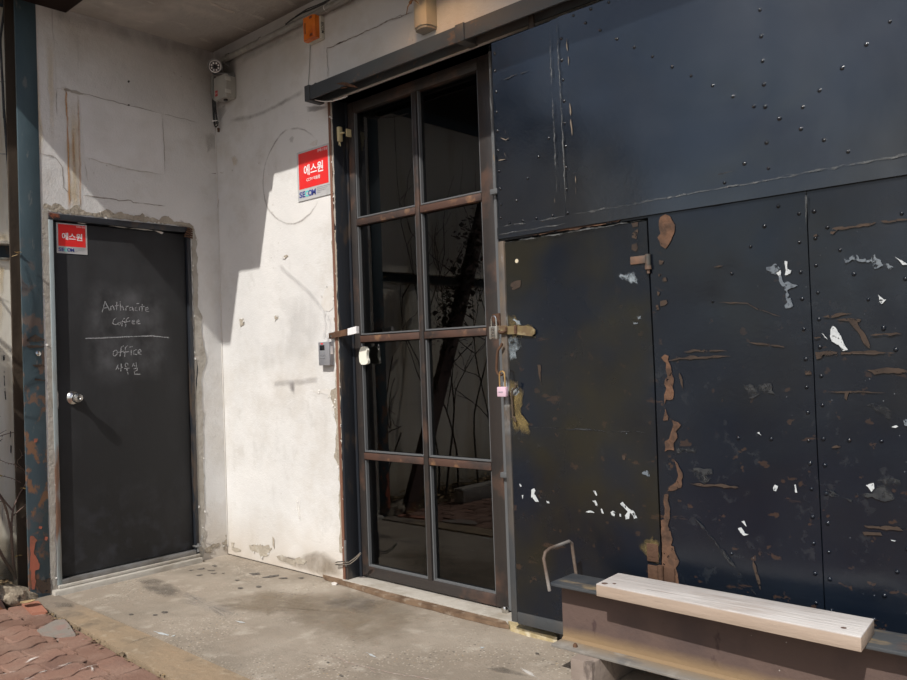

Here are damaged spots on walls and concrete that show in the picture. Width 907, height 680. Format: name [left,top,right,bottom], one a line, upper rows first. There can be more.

corrosion [657,214,675,249]
corrosion [815,318,892,359]
flaking render [27,203,306,593]
corrosion [509,386,527,429]
corrosion [646,355,713,584]
corrosion [846,478,901,502]
corrosion [863,525,903,536]